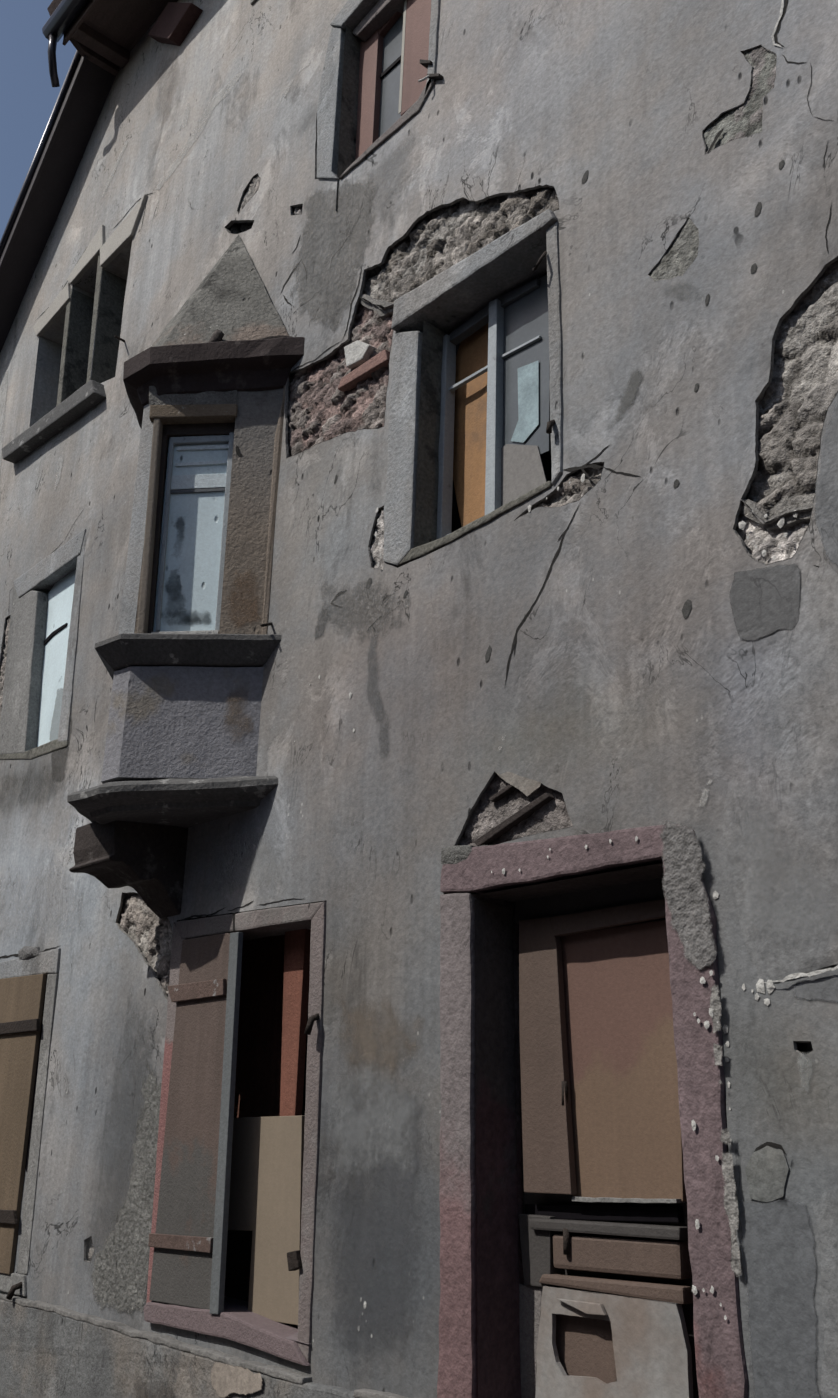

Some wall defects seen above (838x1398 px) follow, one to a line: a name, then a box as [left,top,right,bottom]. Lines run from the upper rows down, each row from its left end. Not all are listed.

spalling [702,45,777,154]
crack [771,0,833,156]
spalling [285,116,559,458]
spalling [648,217,699,281]
crack [824,200,832,252]
spalling [733,256,838,565]
crack [504,445,641,689]
spalling [454,771,573,858]
peeling [660,559,838,1088]
spalling [116,892,180,1002]
spalling [715,1130,741,1276]
peeling [811,1187,838,1398]